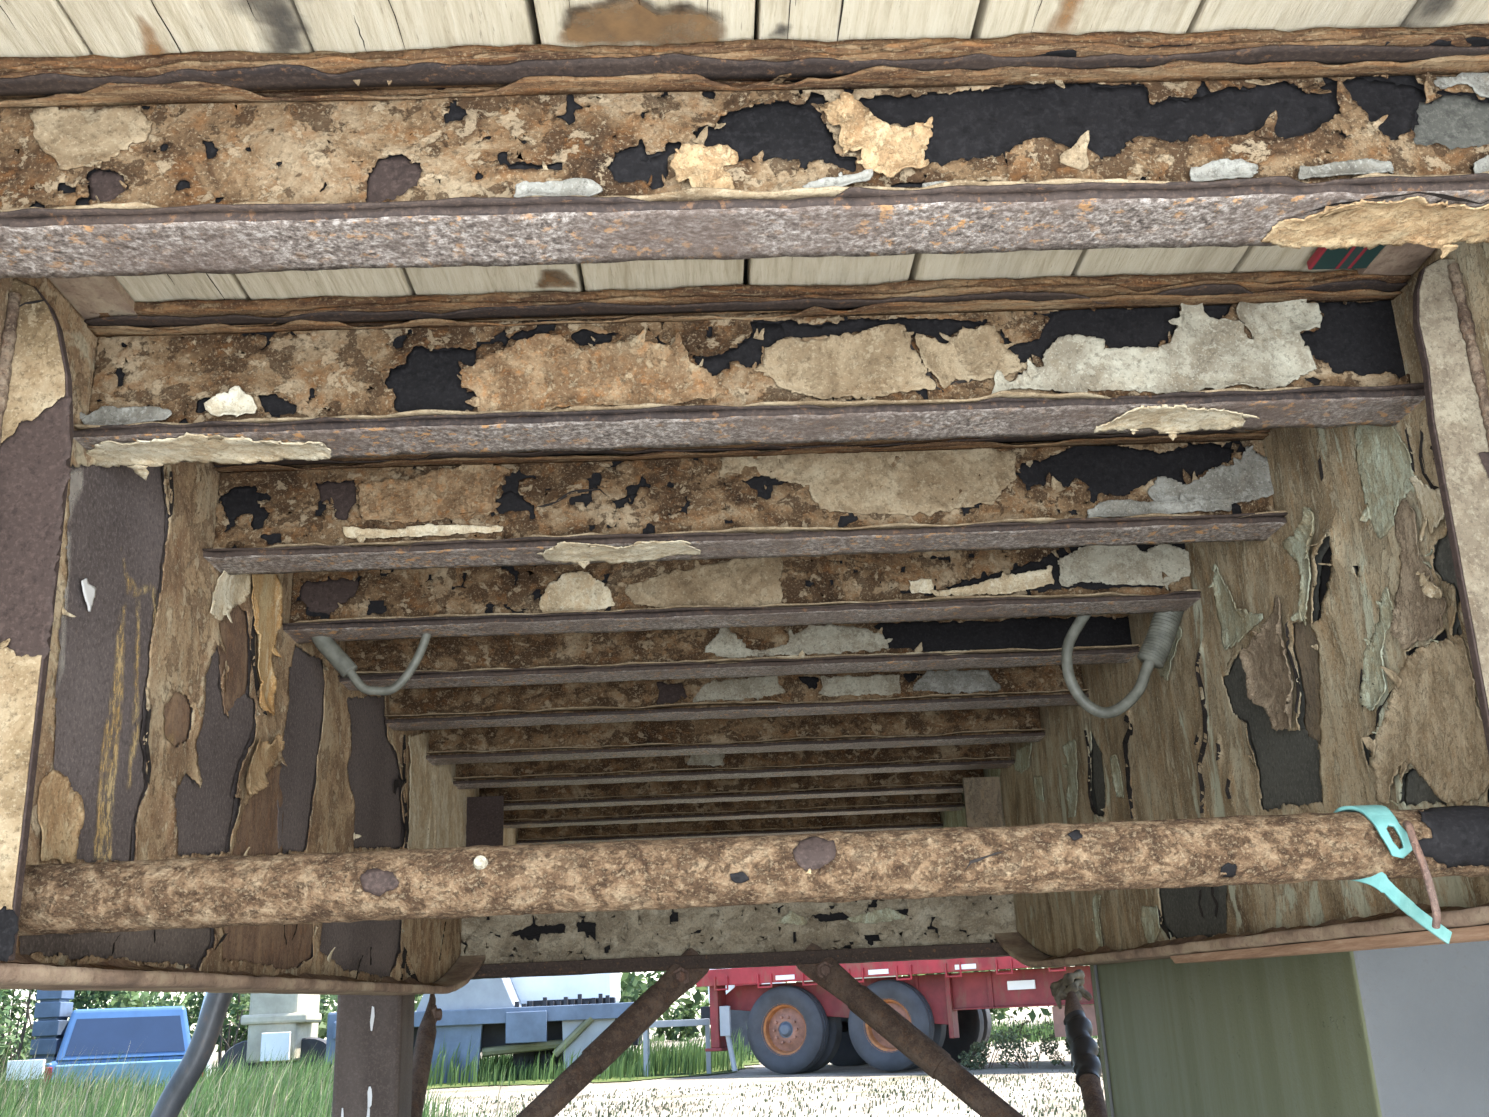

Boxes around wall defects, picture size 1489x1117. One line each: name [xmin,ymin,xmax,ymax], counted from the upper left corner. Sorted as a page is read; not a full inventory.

peeling [29,106,153,204]
peeling [608,73,874,190]
peeling [858,49,1489,187]
corrosion [1261,196,1489,259]
peeling [195,386,297,417]
peeling [385,344,477,412]
peeling [692,299,1406,400]
peeling [1018,443,1274,518]
peeling [909,543,1191,597]
peeling [0,396,172,863]
peeling [656,616,1132,705]
peeling [164,571,359,857]